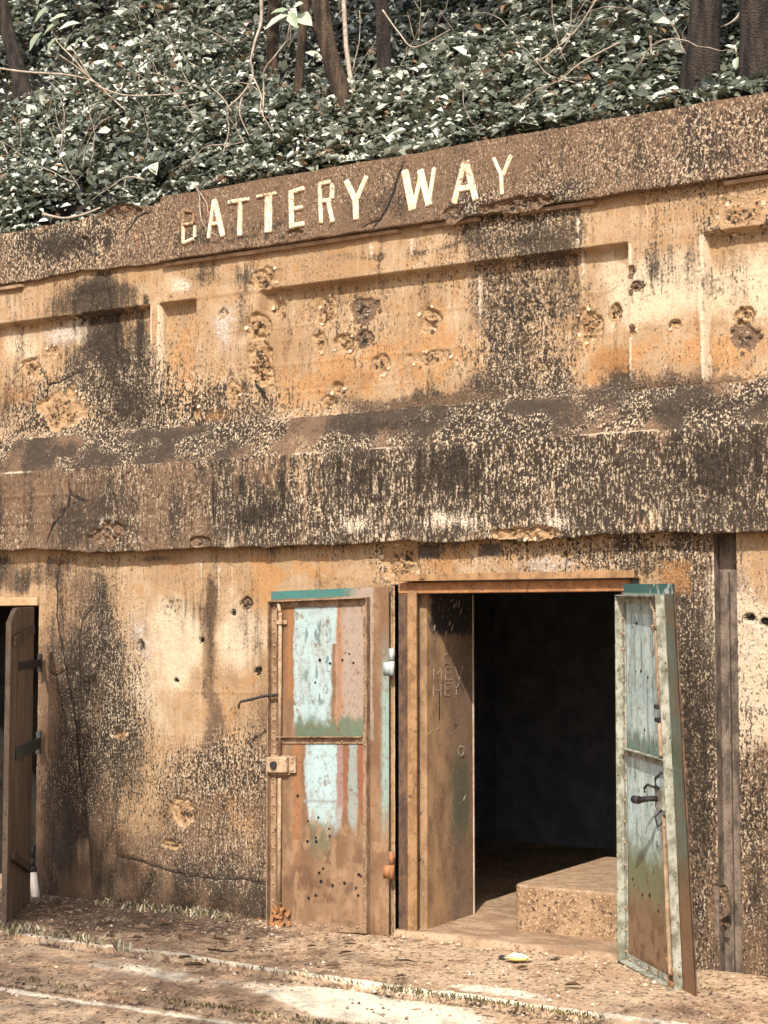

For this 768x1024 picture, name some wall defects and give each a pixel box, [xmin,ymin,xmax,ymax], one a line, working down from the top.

spalling [478,193,558,214]
spalling [212,264,287,407]
spalling [313,291,391,378]
spalling [730,305,764,355]
damp [336,453,382,533]
damp [415,445,500,530]
damp [479,543,502,556]
spalling [492,525,574,542]
damp [538,509,569,530]
damp [666,433,768,505]
crack [46,479,97,893]
crack [117,856,262,885]